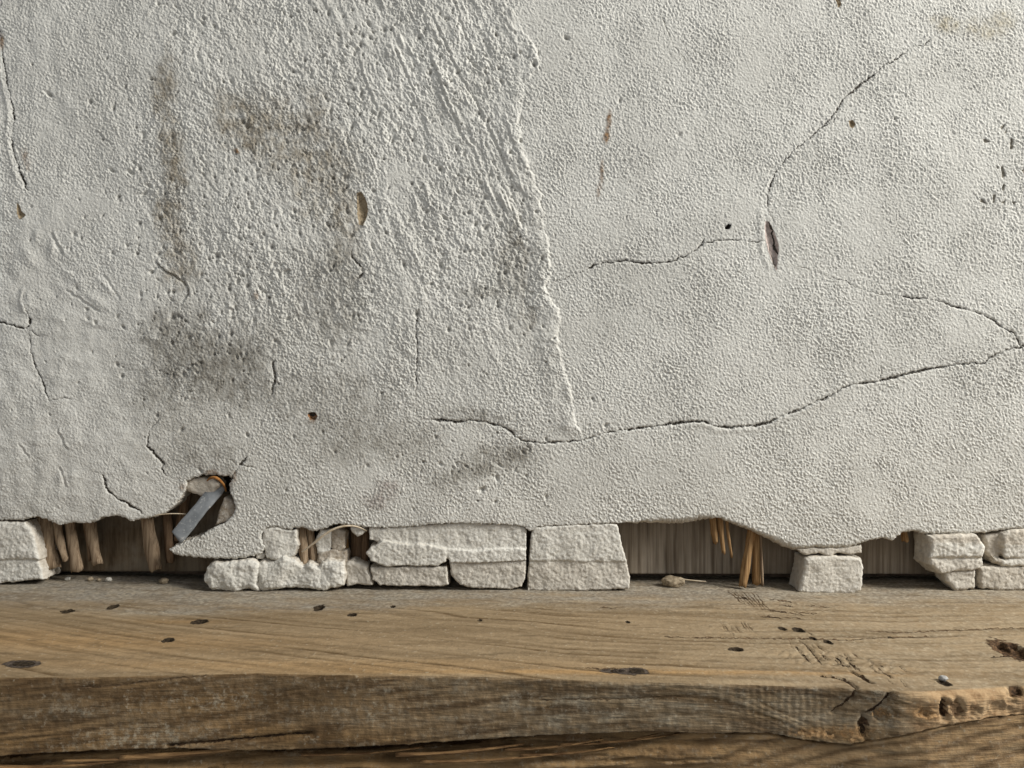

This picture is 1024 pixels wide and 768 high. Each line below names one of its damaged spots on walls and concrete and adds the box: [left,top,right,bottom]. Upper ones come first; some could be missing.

crack [0,31,28,190]
crack [766,32,939,219]
crack [555,238,760,282]
spalling [760,221,779,270]
crack [415,267,1024,456]
crack [140,398,167,476]
crack [94,471,142,514]